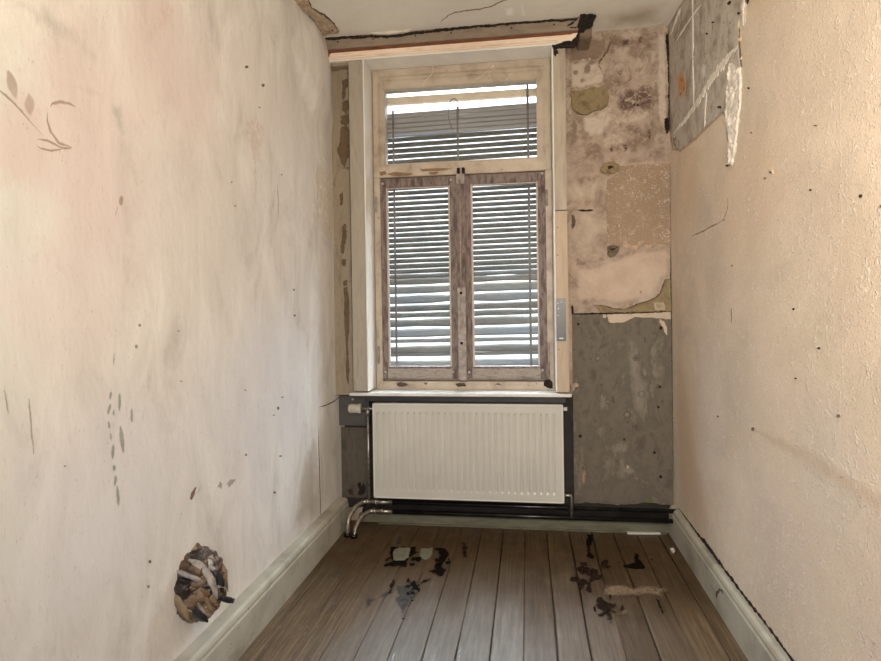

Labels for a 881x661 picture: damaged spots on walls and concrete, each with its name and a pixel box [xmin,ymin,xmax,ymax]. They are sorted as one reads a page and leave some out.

spalling [295,0,339,35]
crack [307,0,576,40]
spalling [569,38,614,147]
leakage [573,0,678,191]
flaking render [656,0,748,167]
spalling [599,161,620,174]
peeling [575,245,672,335]